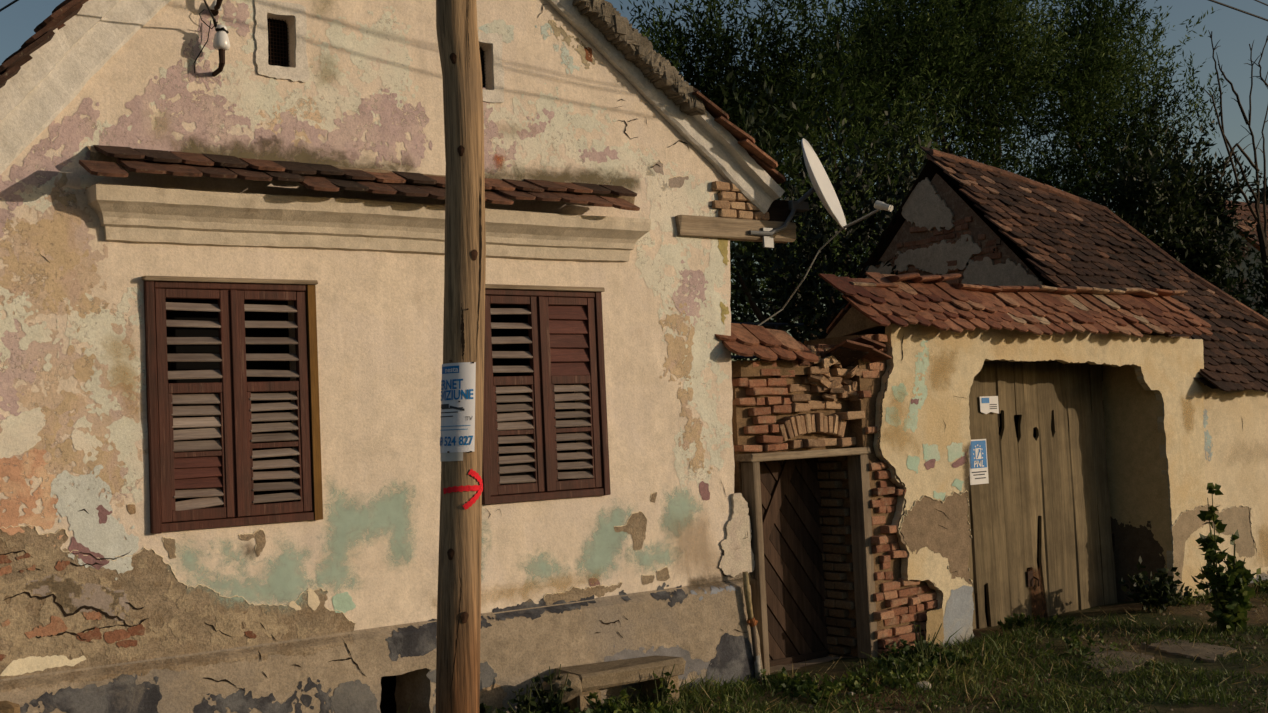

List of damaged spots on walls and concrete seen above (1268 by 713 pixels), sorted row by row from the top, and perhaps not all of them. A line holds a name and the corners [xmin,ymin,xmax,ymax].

flaking render [535,19,595,74]
crack [616,99,647,139]
flaking render [866,177,1043,286]
peeling [0,0,437,713]
peeling [480,83,753,629]
peeling [886,340,929,432]
crack [0,550,149,642]
flaking render [898,442,974,646]
flaking render [1110,504,1255,602]
crack [205,622,276,691]
crack [295,640,364,675]
peeling [604,633,756,691]